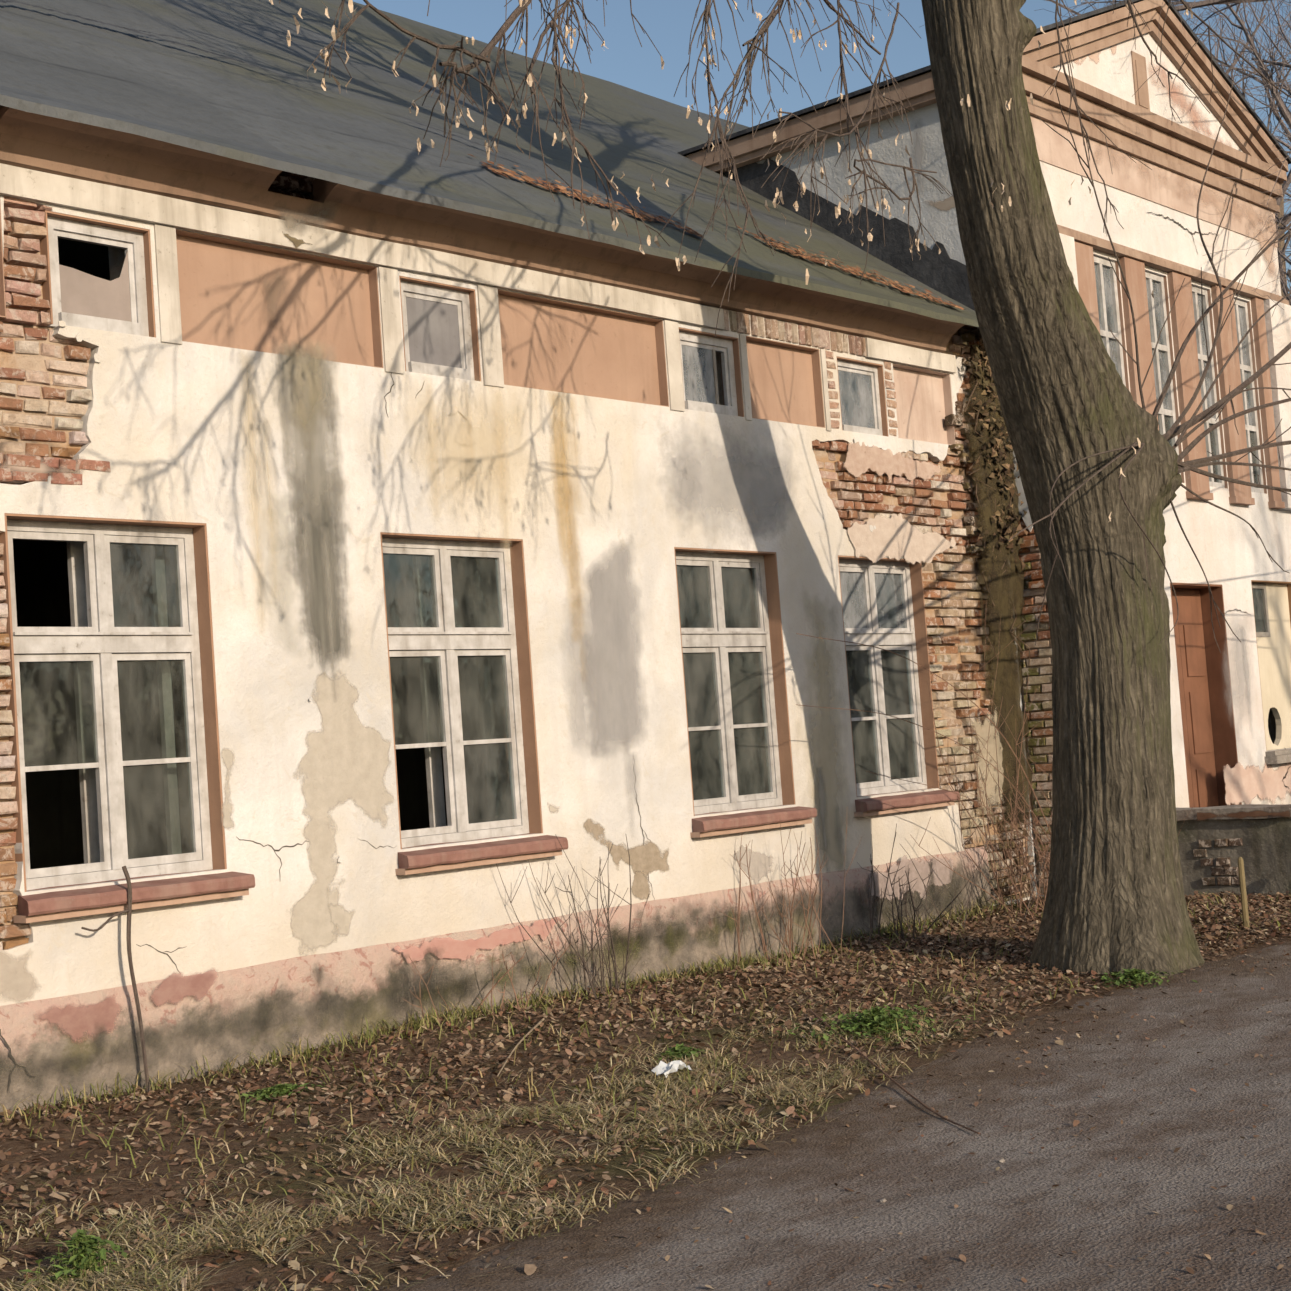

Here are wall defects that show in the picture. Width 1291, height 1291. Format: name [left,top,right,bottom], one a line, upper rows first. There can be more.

spalling [0,196,111,485]
water stain [281,347,345,664]
water stain [682,454,787,521]
water stain [572,549,640,746]
spalling [812,325,1053,903]
spalling [0,543,36,1001]
crack [238,838,309,874]
peeling [291,673,393,952]
peeling [584,819,669,899]
peeling [1224,762,1291,805]
peeling [151,969,217,1006]
water stain [385,967,472,1006]